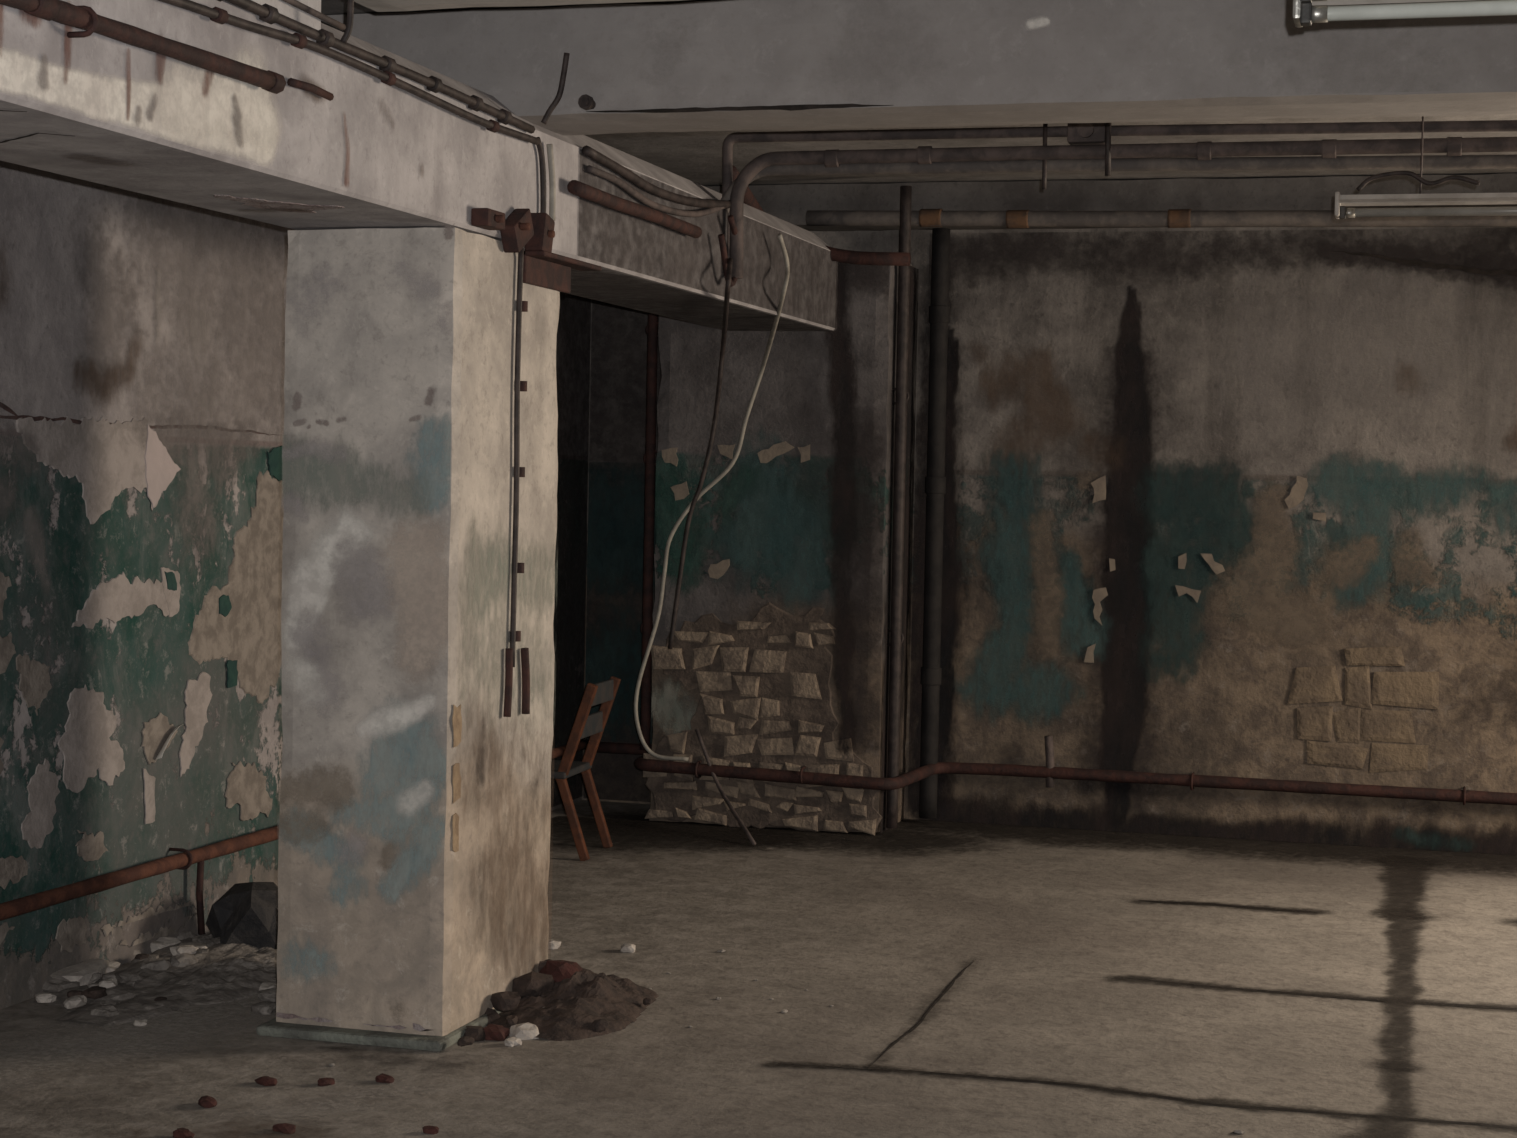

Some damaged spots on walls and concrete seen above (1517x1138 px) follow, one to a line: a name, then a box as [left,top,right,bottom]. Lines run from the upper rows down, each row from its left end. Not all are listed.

peeling [16,416,181,524]
peeling [662,448,689,501]
peeling [757,441,810,463]
peeling [0,572,52,715]
peeling [72,446,449,824]
peeling [708,559,730,579]
damp [550,152,1517,1138]
peeling [0,685,125,889]
spalling [452,704,462,852]
spalling [643,602,883,836]
peeling [55,901,205,952]